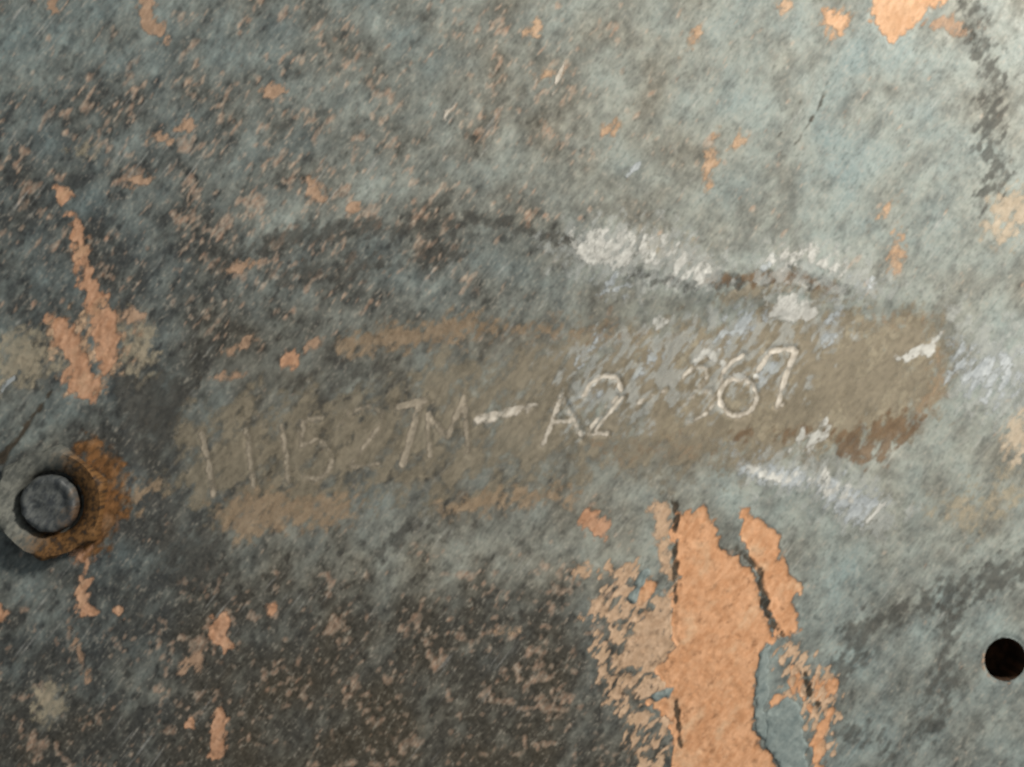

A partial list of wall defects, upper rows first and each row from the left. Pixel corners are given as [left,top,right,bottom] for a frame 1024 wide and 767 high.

peeling [869,0,967,44]
peeling [43,185,146,404]
rust [69,437,161,574]
peeling [572,502,844,767]